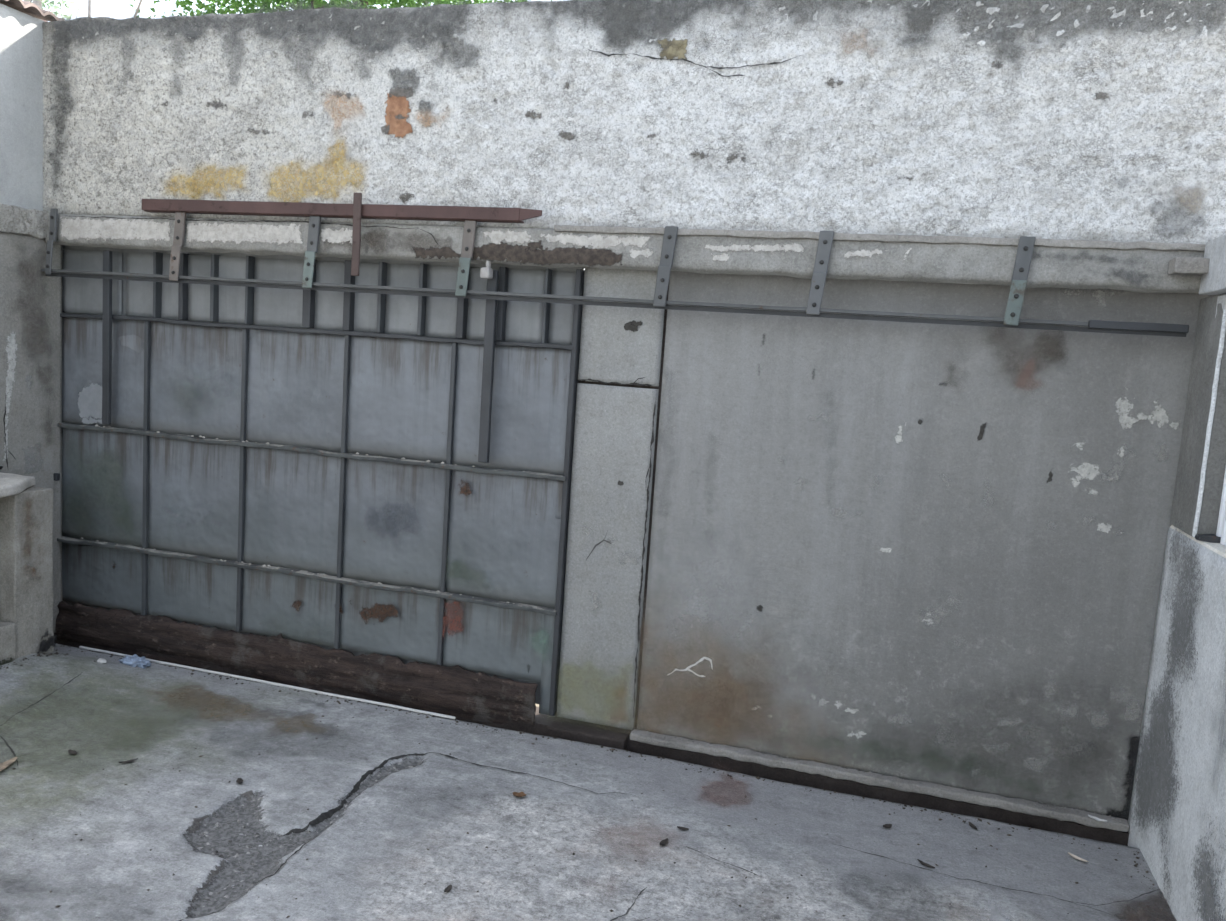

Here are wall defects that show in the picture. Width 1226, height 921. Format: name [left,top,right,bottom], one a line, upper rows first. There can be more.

damp [496,0,738,48]
damp [773,0,1226,61]
damp [50,0,478,175]
damp [269,143,362,202]
peeling [1115,388,1179,430]
peeling [1068,440,1126,495]
corrosion [339,600,399,625]
crack [0,674,81,766]
spalling [180,756,426,919]
crack [248,752,624,889]
crack [610,887,650,921]